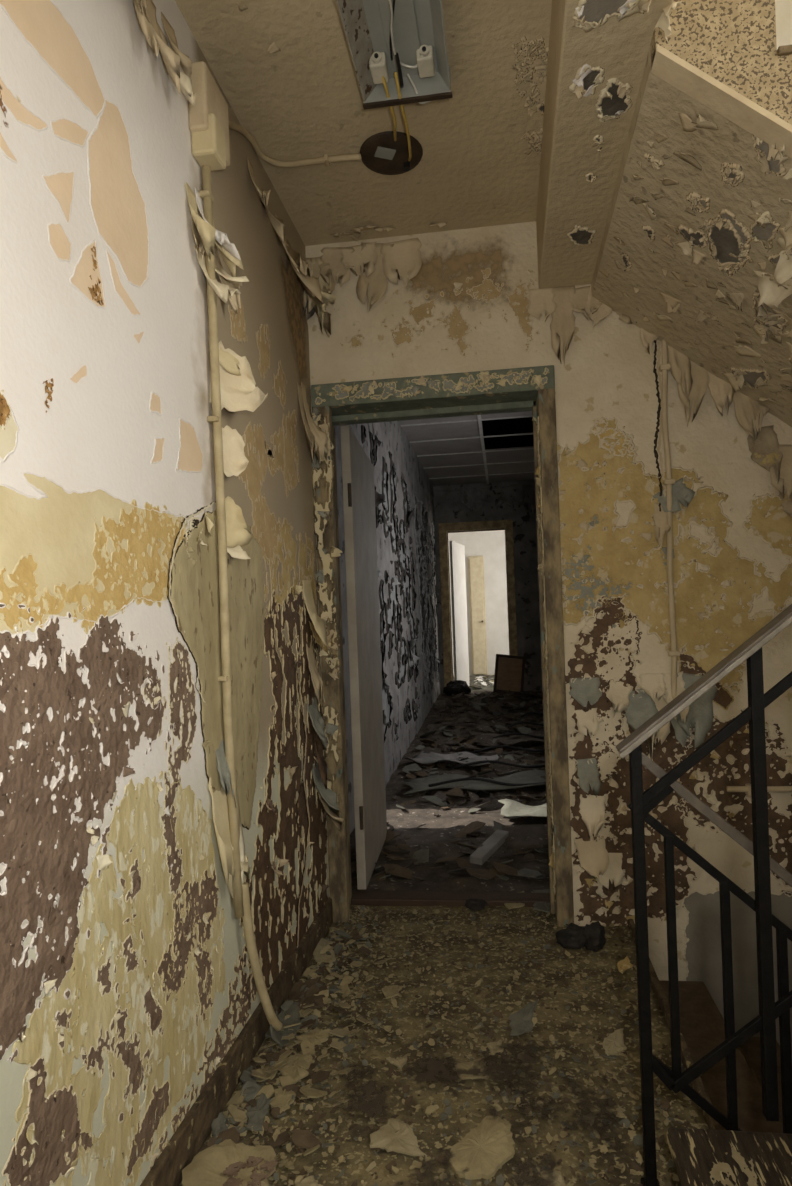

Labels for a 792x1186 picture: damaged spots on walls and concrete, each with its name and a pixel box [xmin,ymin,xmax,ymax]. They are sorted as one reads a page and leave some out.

peeling [569,63,633,152]
peeling [573,0,681,42]
crack [653,340,667,514]
peeling [557,132,792,927]
peeling [0,157,681,1186]
peeling [708,1147,760,1186]